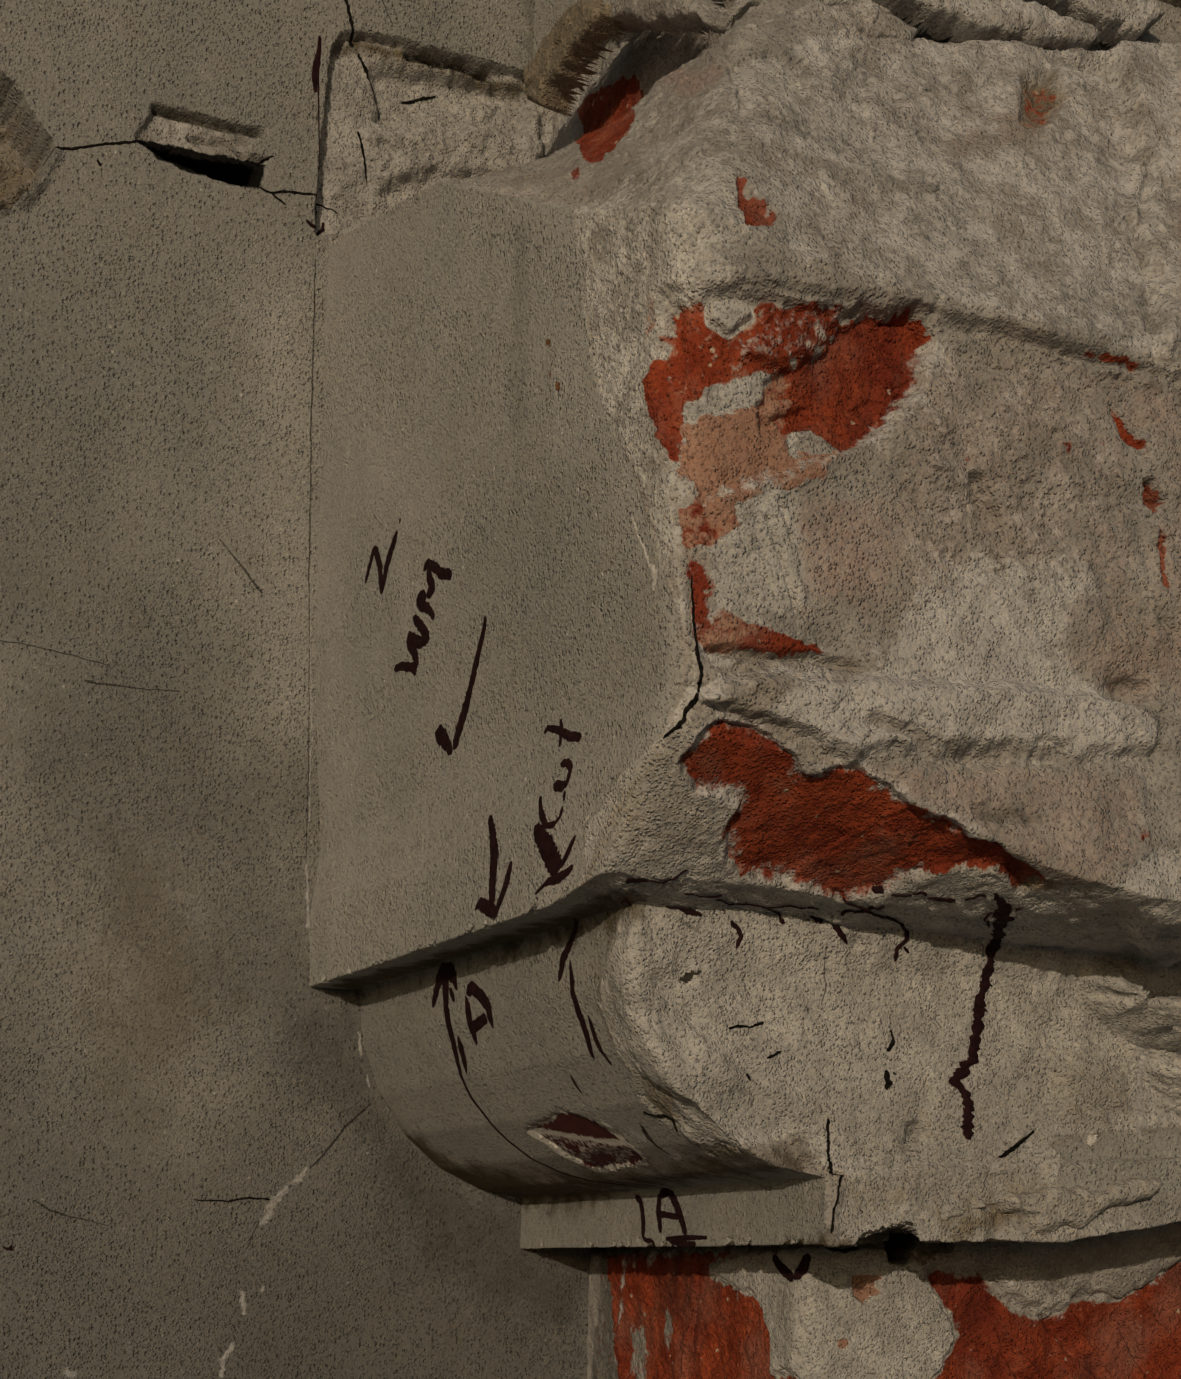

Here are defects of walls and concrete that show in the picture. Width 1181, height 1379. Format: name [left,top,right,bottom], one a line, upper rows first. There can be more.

crack [344,0,436,182]
crack [43,140,138,166]
spalling [136,107,271,186]
crack [252,155,337,213]
spalling [315,0,1181,902]
crack [663,575,704,738]
spalling [679,970,702,983]
crack [621,869,1034,1158]
peeling [527,1109,682,1172]
crack [194,1195,270,1203]
flaking render [709,1227,961,1379]